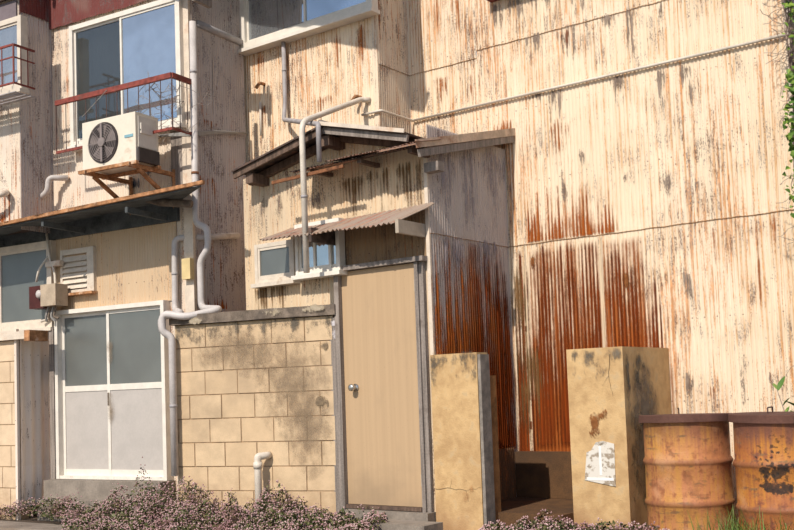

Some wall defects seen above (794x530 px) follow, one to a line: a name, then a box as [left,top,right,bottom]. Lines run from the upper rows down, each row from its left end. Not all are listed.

corrosion [433,188,663,452]
damp [613,349,657,500]